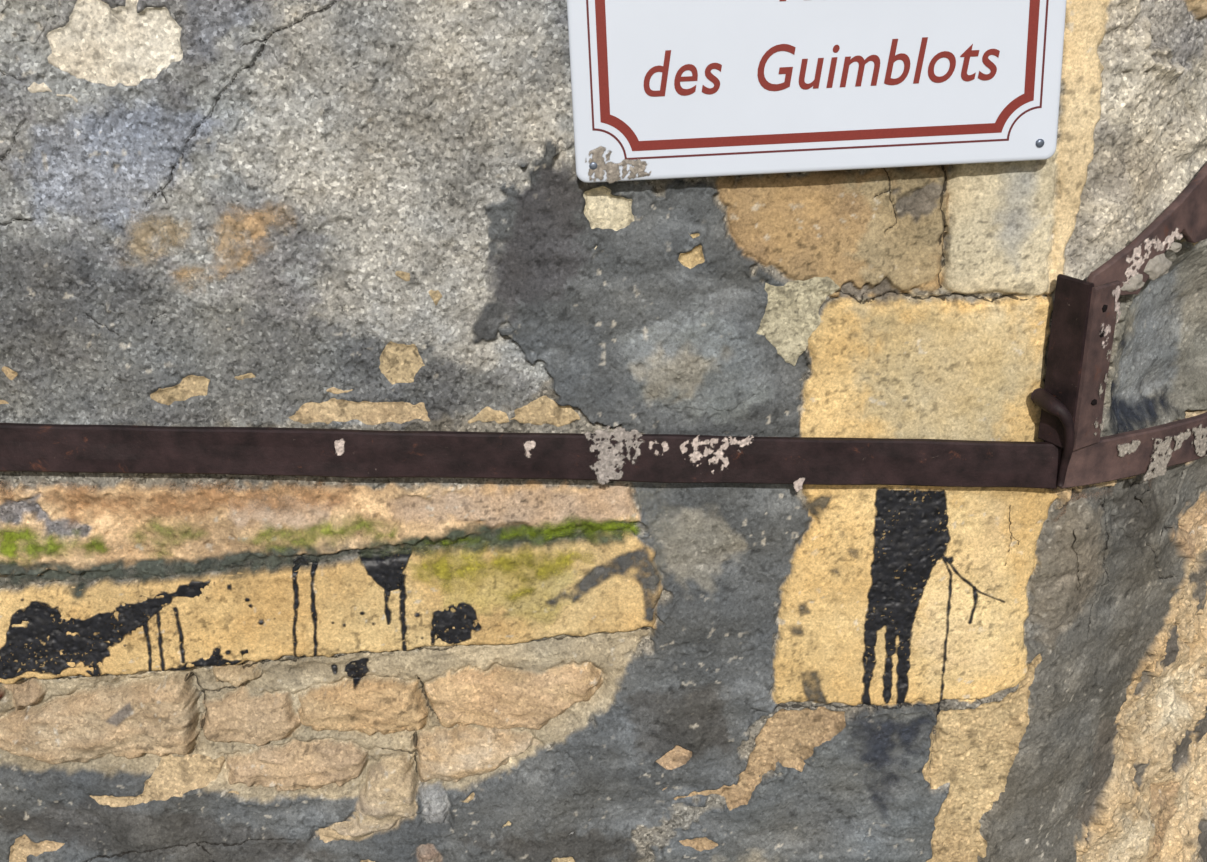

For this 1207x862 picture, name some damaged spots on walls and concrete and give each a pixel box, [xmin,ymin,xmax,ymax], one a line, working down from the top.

spalling [46,0,183,87]
spalling [28,82,78,102]
crack [145,1,337,208]
peeling [1123,228,1183,284]
spalling [756,276,840,366]
spalling [90,754,225,807]
spalling [656,745,692,770]
spalling [662,707,846,811]
spalling [922,654,1042,862]
spalling [318,827,351,843]
spalling [679,837,718,852]